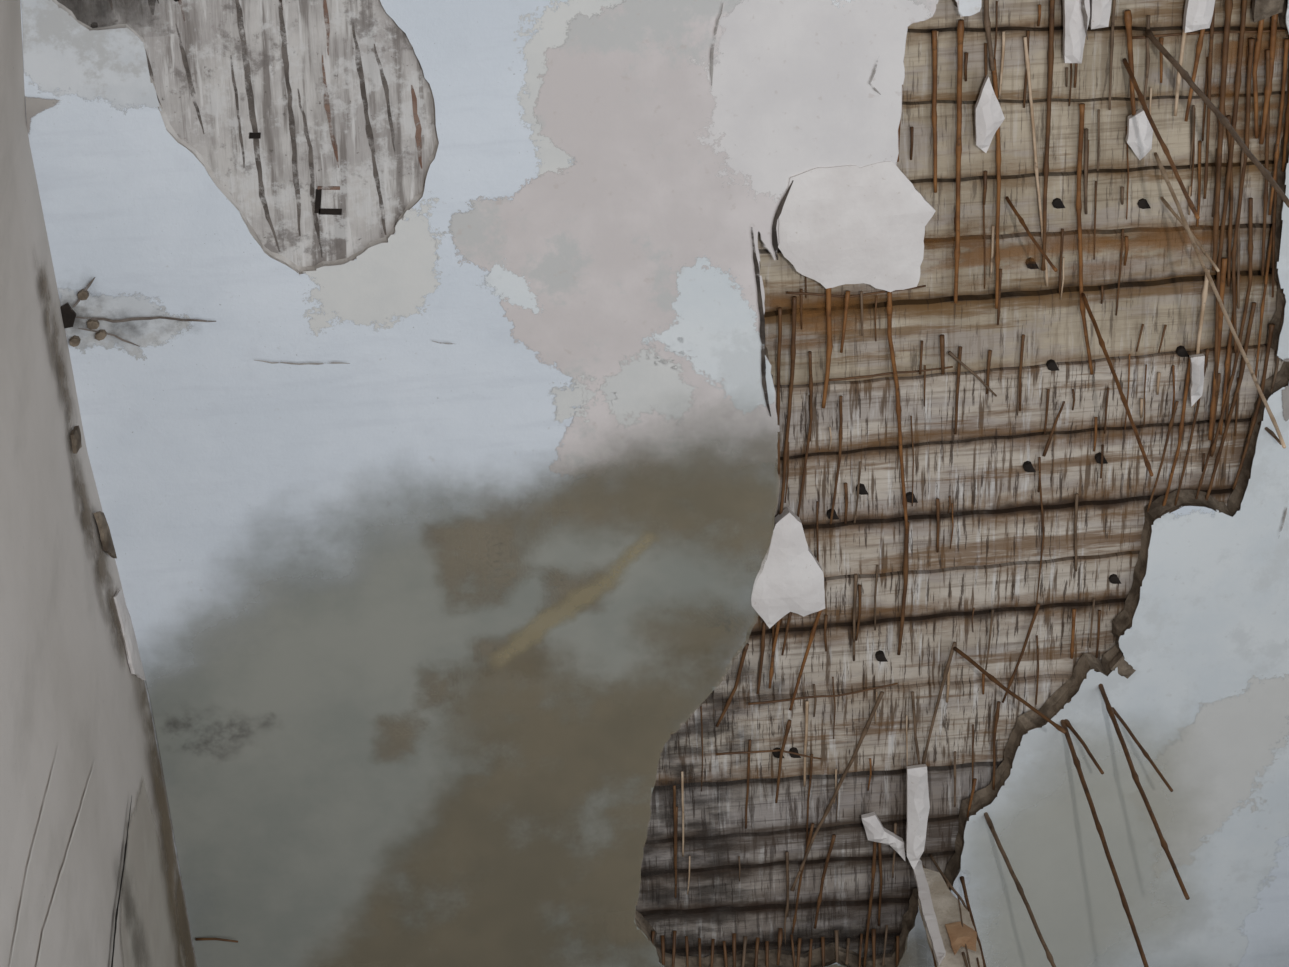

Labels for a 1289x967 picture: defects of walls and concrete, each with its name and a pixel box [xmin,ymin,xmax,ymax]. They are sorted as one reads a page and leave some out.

crack [1080,0,1088,40]
spalling [21,0,444,336]
peeling [58,287,194,360]
peeling [70,425,82,454]
peeling [444,0,1289,967]
peeling [93,511,117,559]
peeling [114,589,146,680]
water stain [143,438,779,967]
crack [111,797,132,967]
peeling [121,780,186,967]
corrosion [945,921,977,955]